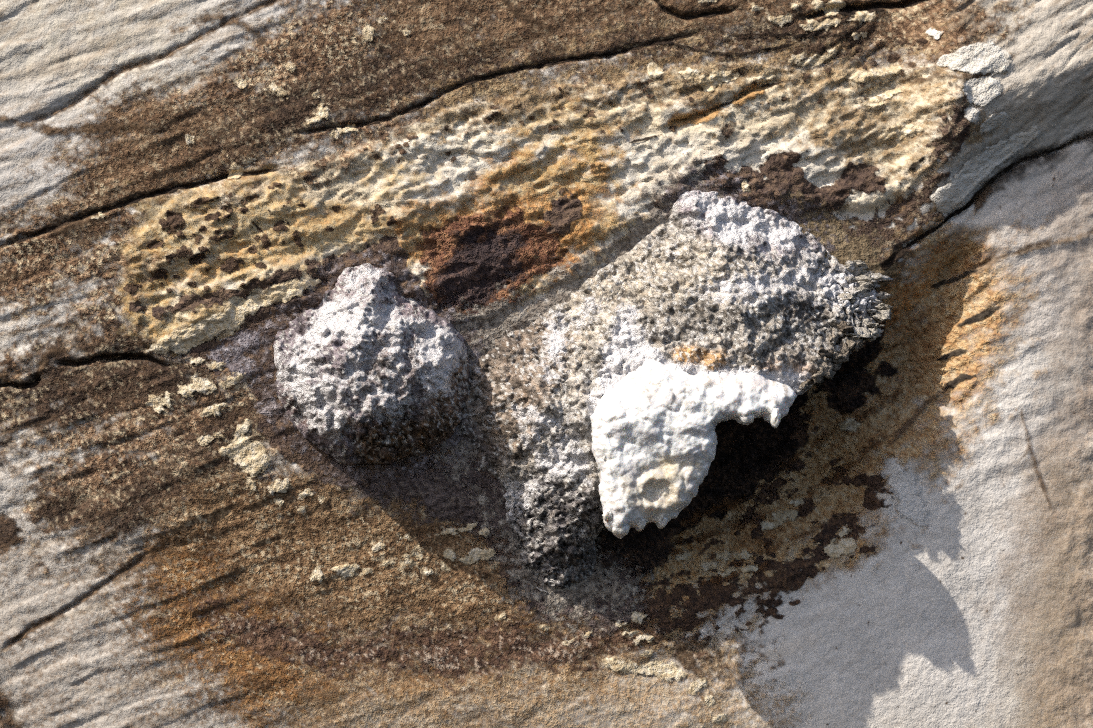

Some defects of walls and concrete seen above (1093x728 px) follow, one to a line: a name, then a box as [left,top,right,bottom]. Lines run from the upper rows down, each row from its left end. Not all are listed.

crack [0,0,281,135]
peeling [306,90,329,125]
peeling [329,124,356,139]
crack [281,0,927,143]
crack [0,168,280,247]
damp [217,254,244,274]
damp [247,210,304,253]
corrosion [120,104,635,340]
crack [881,133,1093,270]
spalling [890,374,976,443]
corrosion [113,225,1034,728]
damp [0,512,49,575]